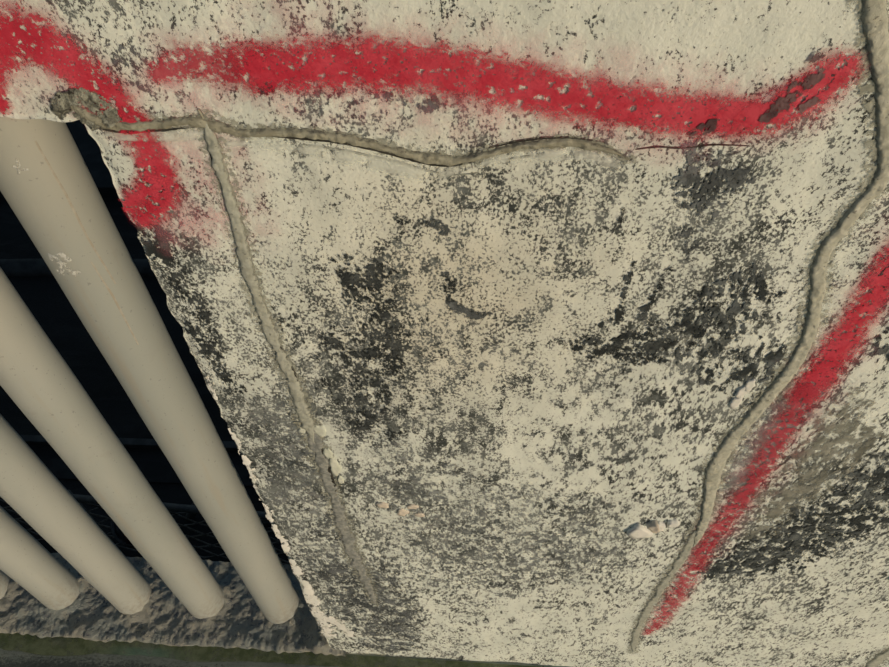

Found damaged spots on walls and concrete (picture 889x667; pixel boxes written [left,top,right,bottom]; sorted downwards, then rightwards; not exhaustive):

crack [71,101,749,606]
crack [627,0,889,654]
crack [862,645,889,667]